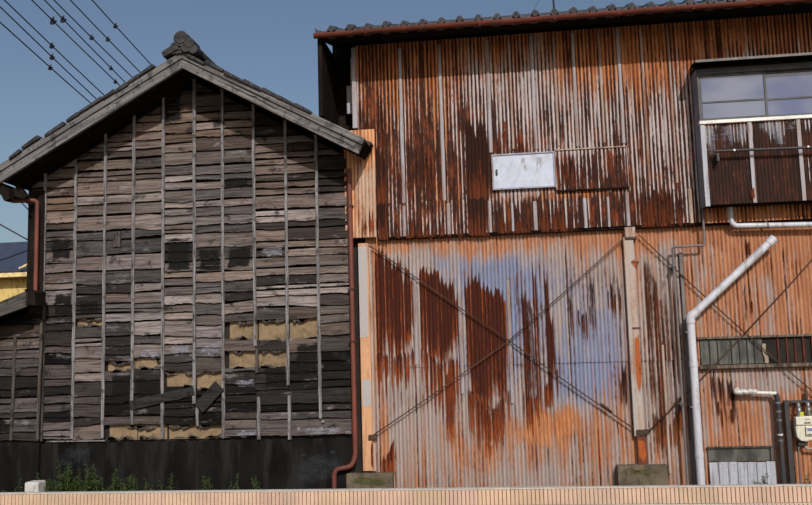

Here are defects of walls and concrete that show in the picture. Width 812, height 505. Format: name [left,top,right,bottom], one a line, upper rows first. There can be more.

corrosion [633,192,694,227]
corrosion [359,92,576,463]
flaking render [108,318,317,391]
corrosion [619,259,683,455]
corrosion [711,370,737,427]
flaking render [105,424,229,440]
corrosion [638,440,646,465]